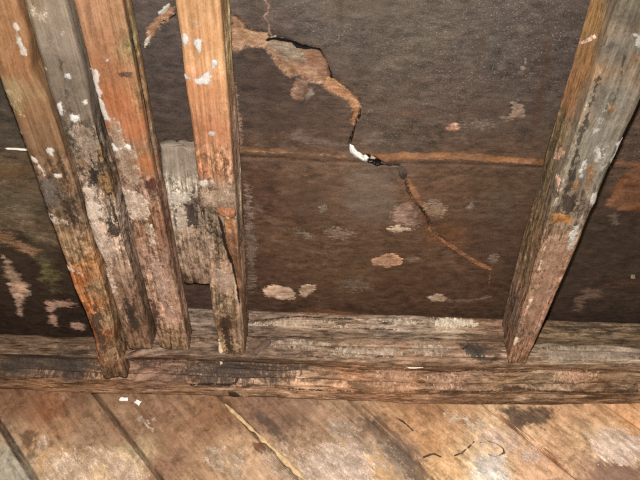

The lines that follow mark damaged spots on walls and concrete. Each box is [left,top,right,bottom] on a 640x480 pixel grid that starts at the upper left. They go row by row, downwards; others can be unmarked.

spalling [230,14,362,126]
crack [263,0,333,78]
crack [349,107,361,148]
peeling [243,181,316,300]
peeling [371,253,421,268]
crack [382,163,492,283]